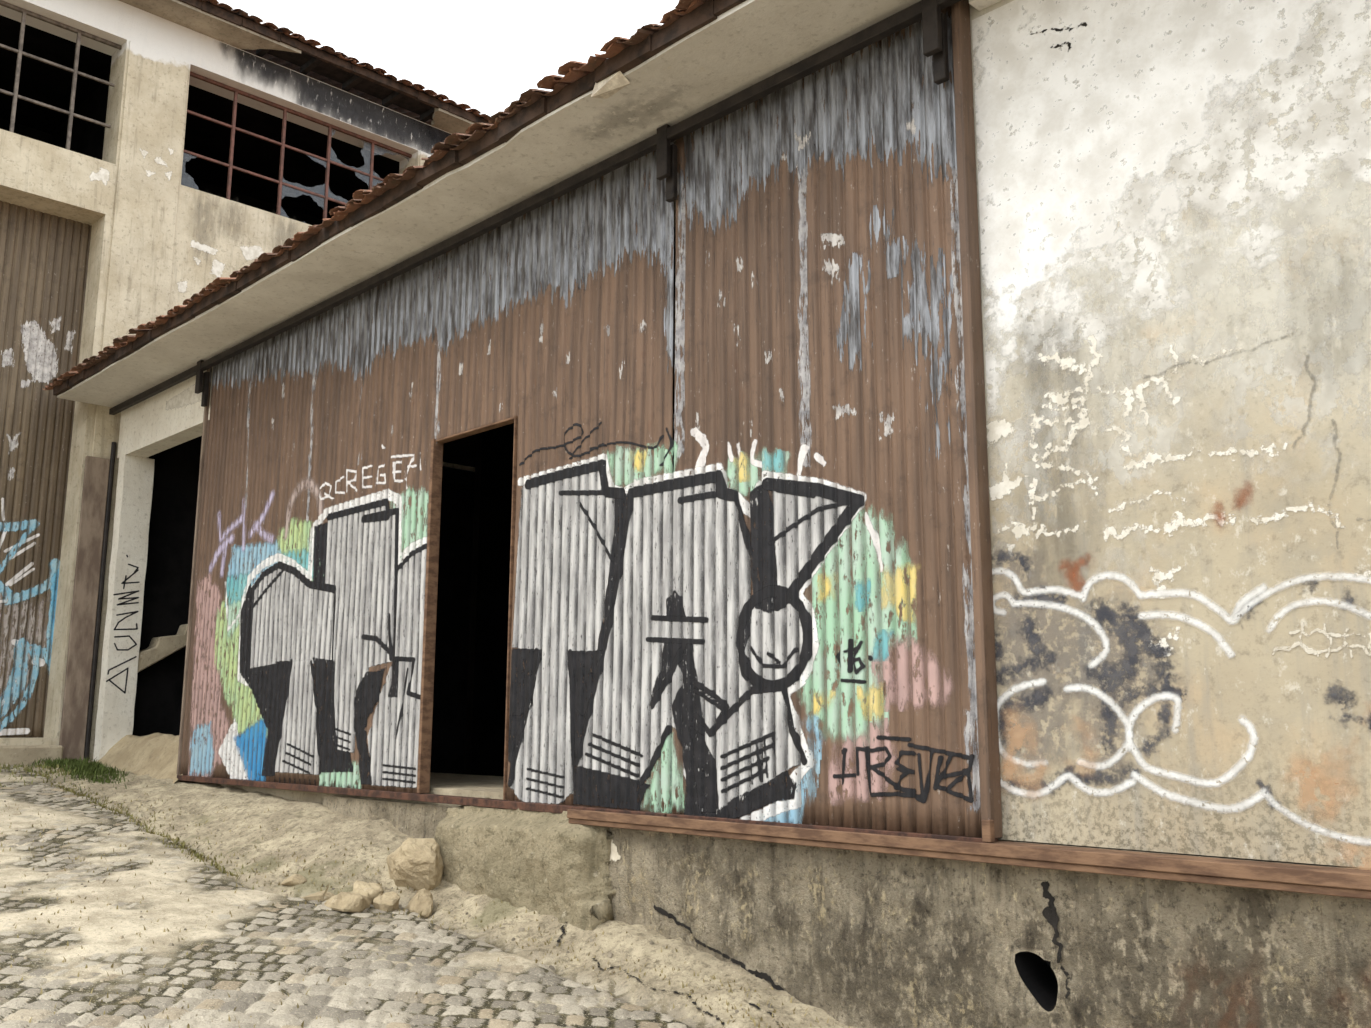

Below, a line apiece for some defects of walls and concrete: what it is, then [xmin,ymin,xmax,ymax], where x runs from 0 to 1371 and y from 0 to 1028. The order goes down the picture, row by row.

peeling [166,12,981,812]
peeling [972,0,1371,556]
crack [998,335,1345,657]
peeling [1327,686,1371,729]
crack [592,905,792,1028]
crack [1041,881,1070,1009]